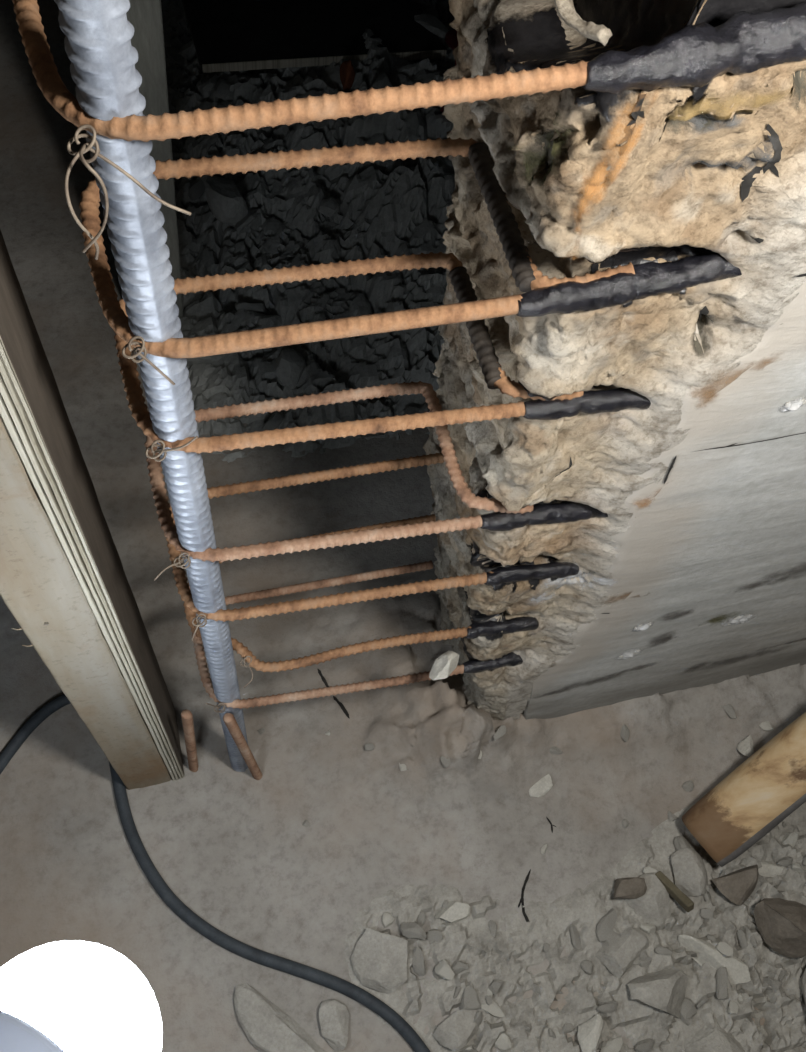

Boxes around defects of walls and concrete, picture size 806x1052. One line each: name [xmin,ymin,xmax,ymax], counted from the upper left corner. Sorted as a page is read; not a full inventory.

spalling [443,0,634,81]
corrosion [579,129,639,212]
spalling [423,60,806,721]
crack [664,432,806,484]